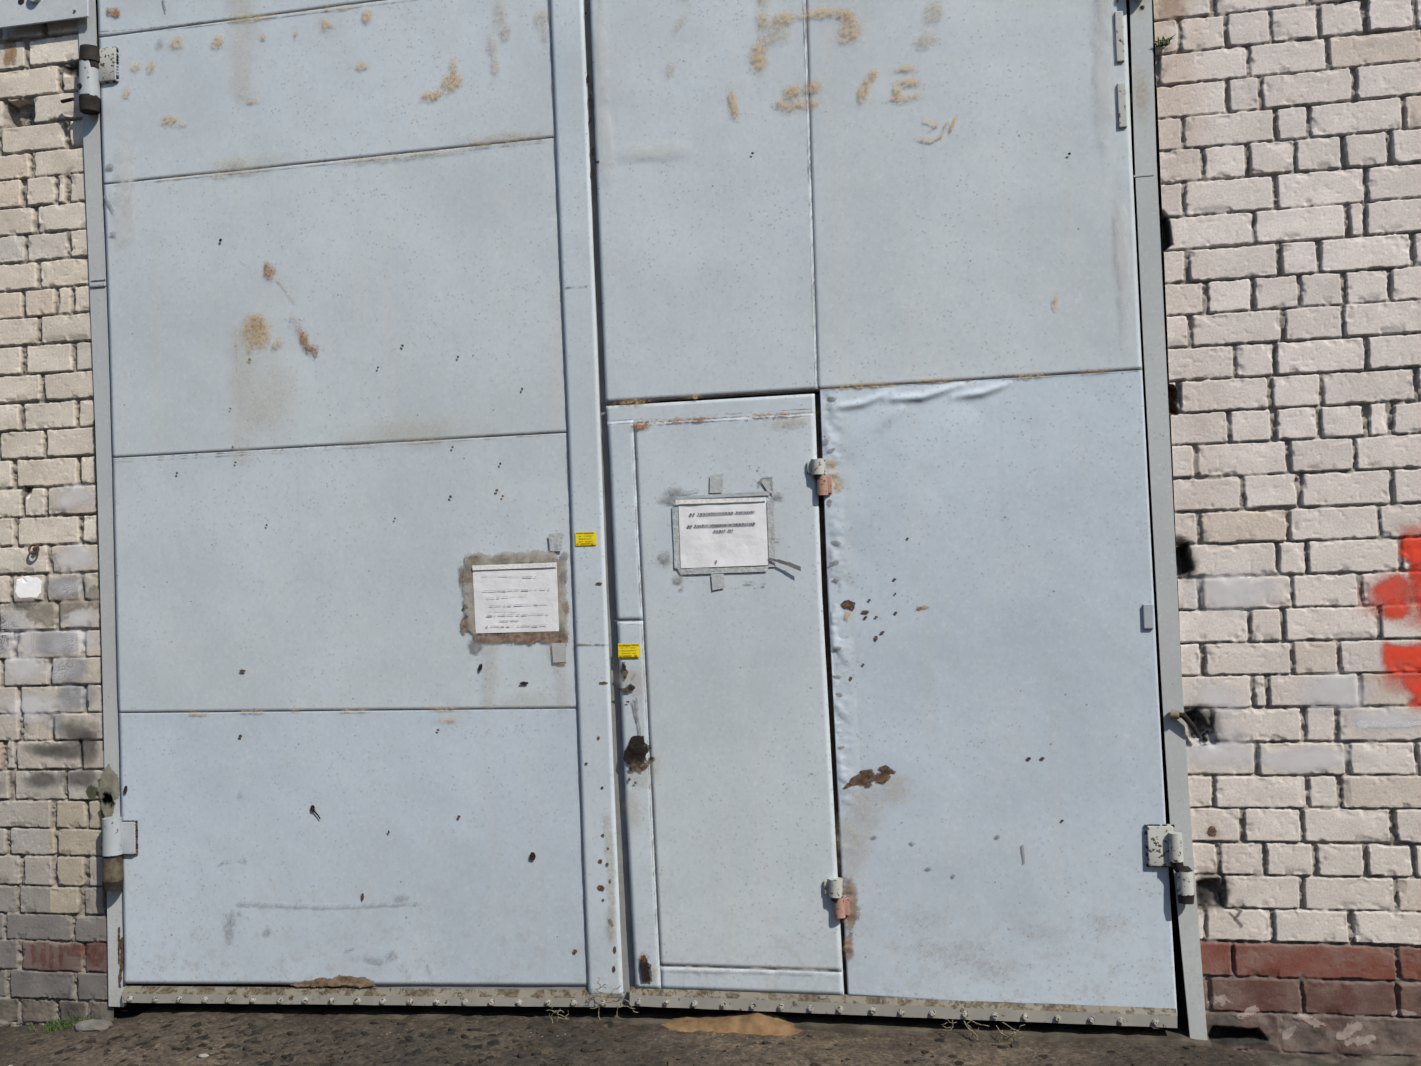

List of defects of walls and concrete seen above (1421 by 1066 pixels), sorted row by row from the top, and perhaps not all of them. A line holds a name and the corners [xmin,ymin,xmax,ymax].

corrosion [843,876,860,959]